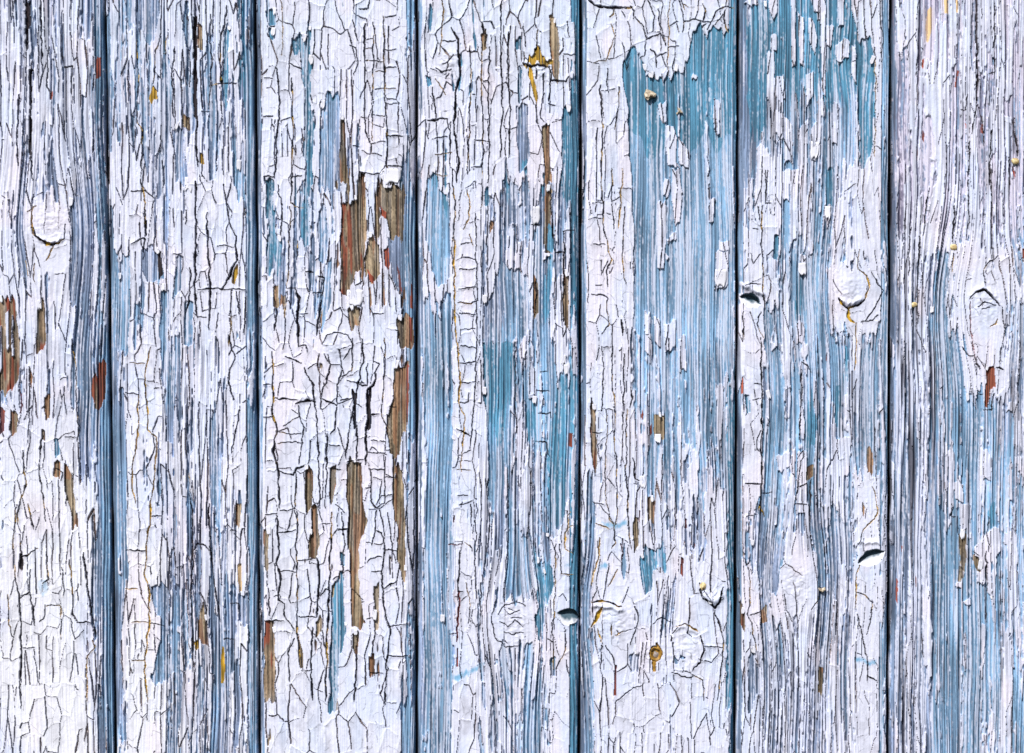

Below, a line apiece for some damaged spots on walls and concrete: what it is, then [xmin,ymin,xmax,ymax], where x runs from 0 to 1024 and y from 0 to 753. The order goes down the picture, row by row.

crack [0,0,250,753]
peeling [89,245,172,412]
peeling [264,178,283,278]
peeling [328,456,380,715]
peeling [387,164,455,720]
peeling [482,103,577,653]
crack [230,0,1024,753]
peeling [640,541,667,596]
peeling [623,0,772,389]
peeling [750,522,786,596]
peeling [852,36,876,170]
peeling [928,247,1001,717]